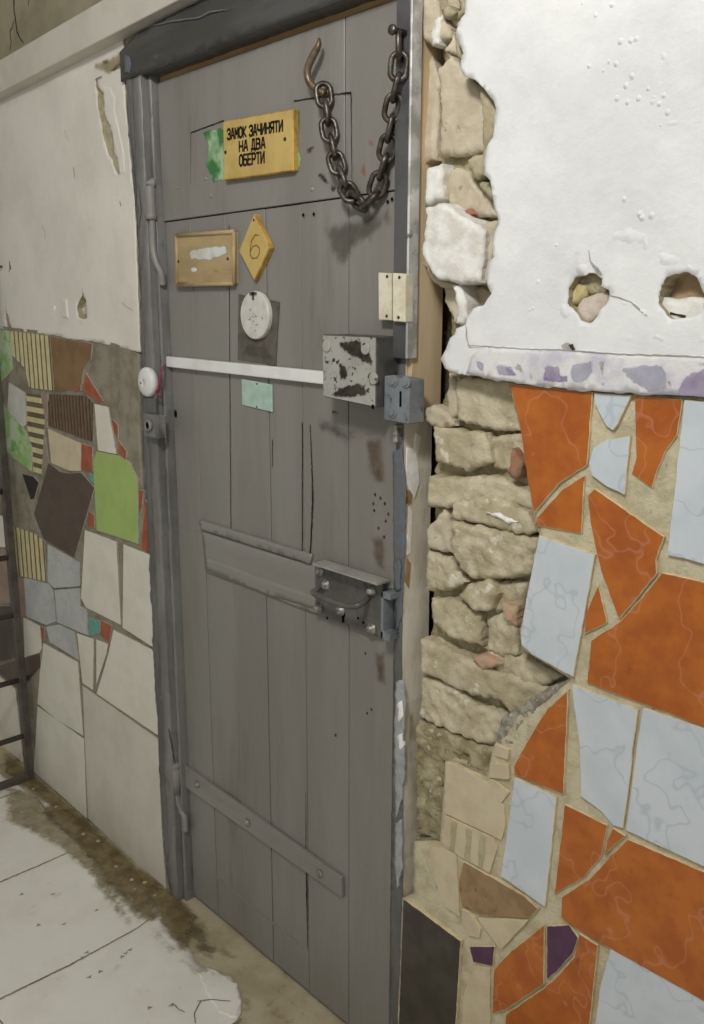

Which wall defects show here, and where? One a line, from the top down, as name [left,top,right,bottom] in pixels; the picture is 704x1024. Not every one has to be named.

crack [9,0,29,51]
flaking render [422,0,498,336]
flaking render [572,250,647,322]
flaking render [372,371,569,889]
water stain [43,803,210,951]